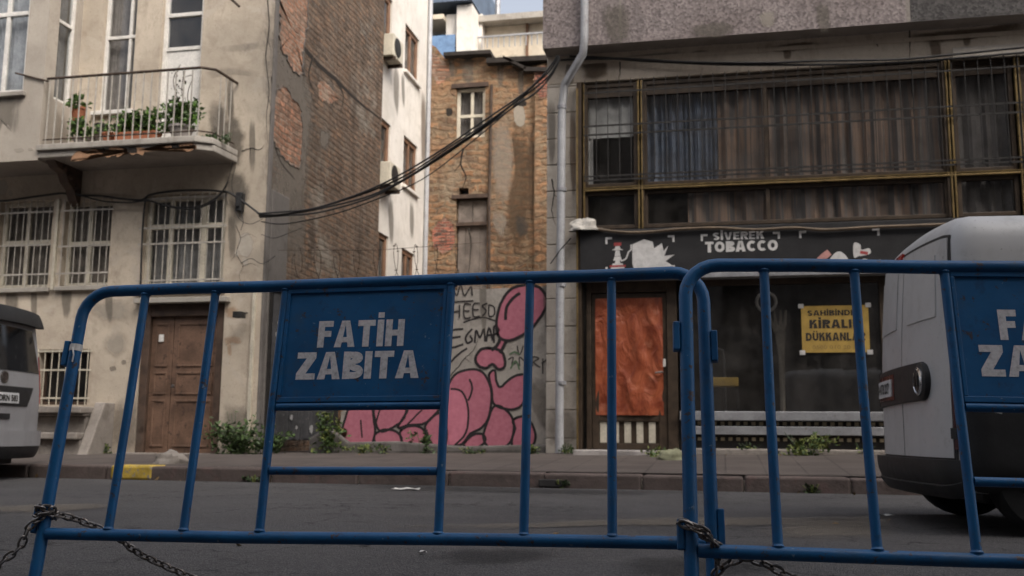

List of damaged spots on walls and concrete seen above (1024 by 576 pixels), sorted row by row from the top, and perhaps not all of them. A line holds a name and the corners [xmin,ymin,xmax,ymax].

flaking render [278,0,309,77]
spalling [71,143,196,161]
flaking render [270,76,303,179]
flaking render [317,81,338,104]
leakage [509,135,534,243]